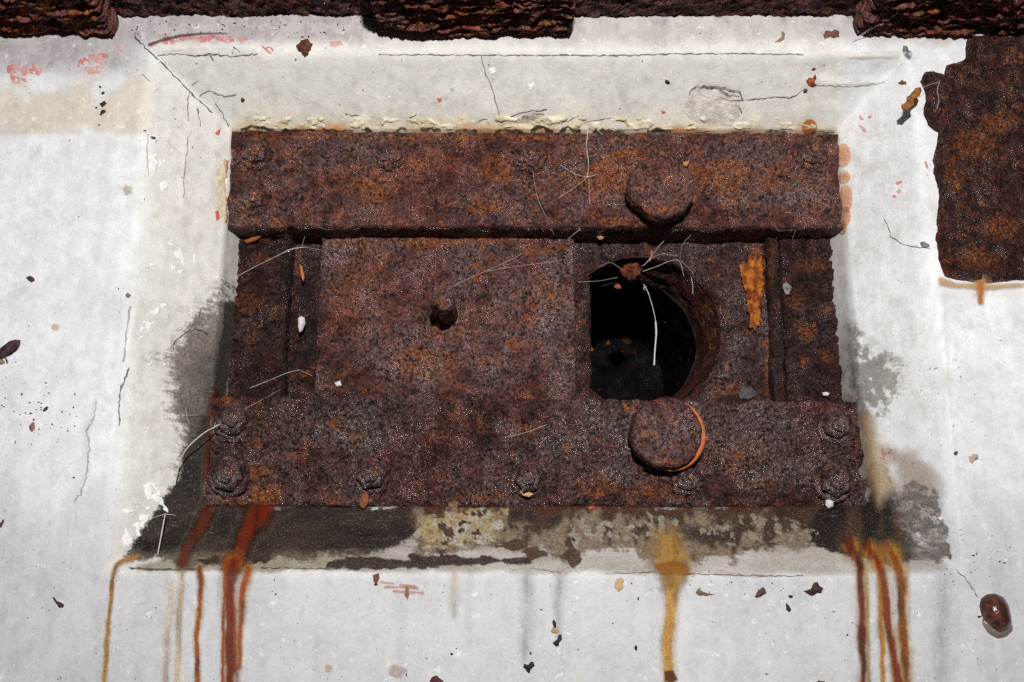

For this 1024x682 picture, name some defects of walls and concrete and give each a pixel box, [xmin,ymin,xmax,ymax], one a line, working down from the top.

crack [134,32,258,198]
rust [838,144,852,234]
rust [739,254,765,331]
water stain [155,279,236,471]
water stain [860,415,935,504]
rust [102,555,139,682]
water stain [140,556,224,570]
rust [175,436,216,682]
rust [221,505,278,682]
water stain [240,507,945,575]
rust [652,531,689,682]
rust [844,538,911,682]